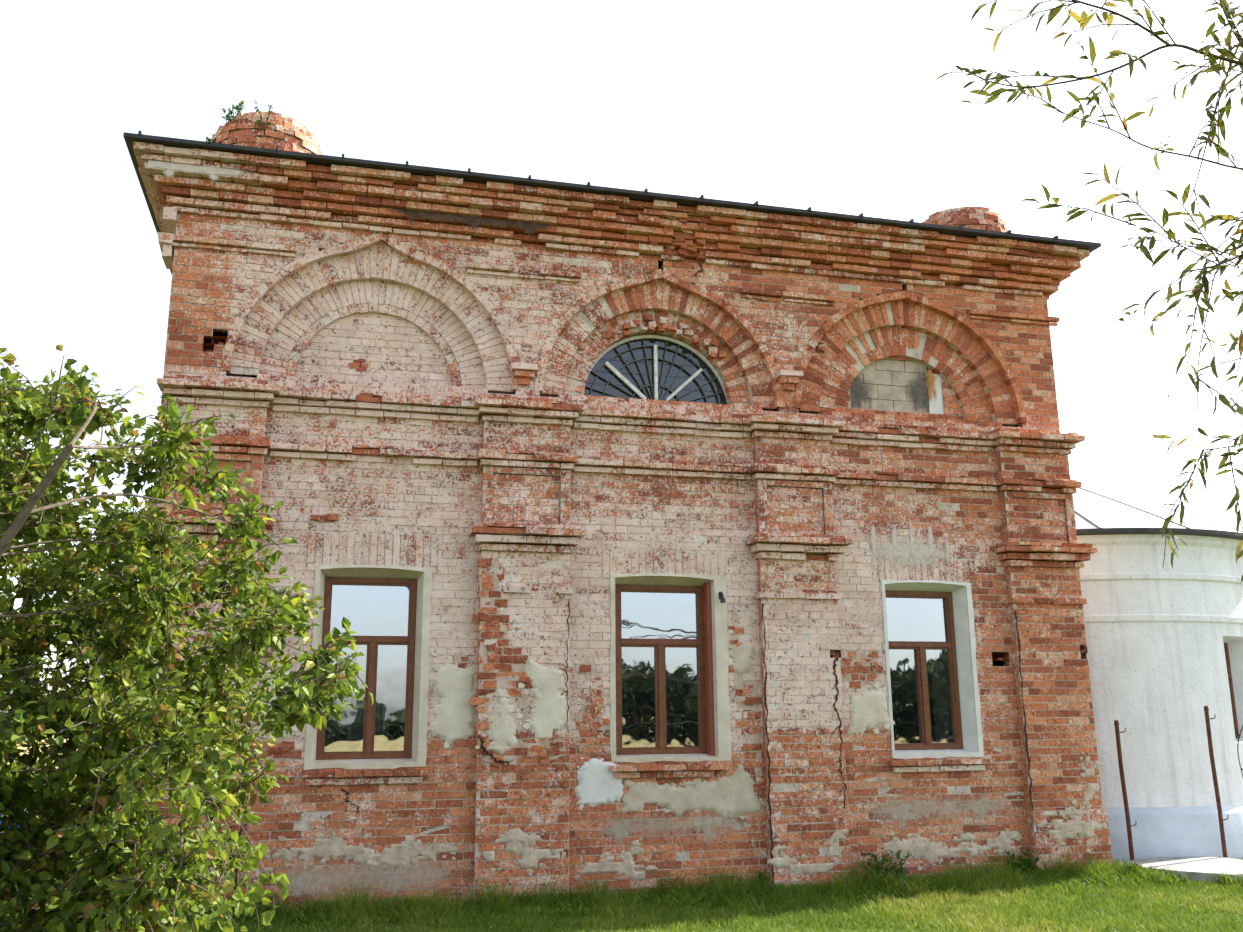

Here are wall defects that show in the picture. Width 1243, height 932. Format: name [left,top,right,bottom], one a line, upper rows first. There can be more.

spalling [202,336,227,352]
spalling [248,647,302,767]
crack [477,734,509,765]
spalling [418,555,766,820]
crack [829,657,847,809]
flaking render [830,650,895,735]
flaking render [262,828,458,874]
flaking render [482,828,566,878]
flaking render [573,832,658,887]